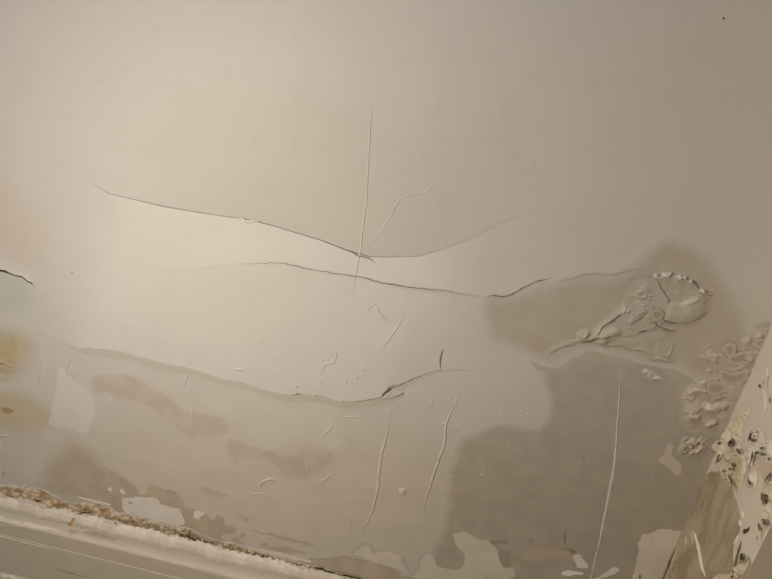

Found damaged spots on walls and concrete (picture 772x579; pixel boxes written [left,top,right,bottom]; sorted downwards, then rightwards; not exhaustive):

crack [0,258,35,286]
crack [241,250,642,297]
leakage [29,227,763,579]
flaking render [0,483,342,575]
peeling [561,554,620,579]
flaking render [632,406,772,579]